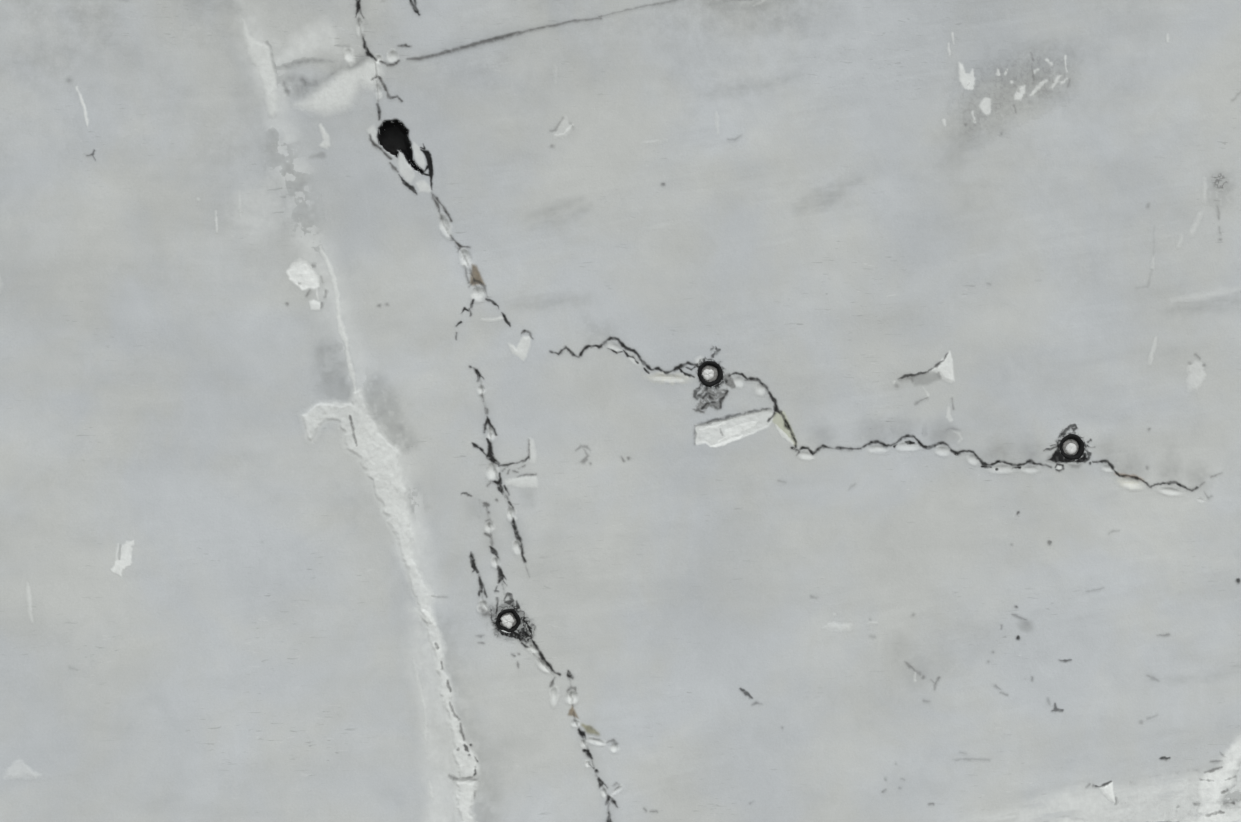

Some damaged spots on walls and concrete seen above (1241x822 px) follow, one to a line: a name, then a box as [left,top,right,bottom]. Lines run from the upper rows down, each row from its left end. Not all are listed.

crack [341,0,808,123]
peeling [366,124,377,142]
peeling [397,141,431,195]
peeling [284,257,329,311]
spalling [691,371,773,449]
crack [429,191,1053,628]
peeling [891,349,964,446]
crack [1091,431,1224,505]
crack [510,639,660,822]
peeling [941,729,1241,822]